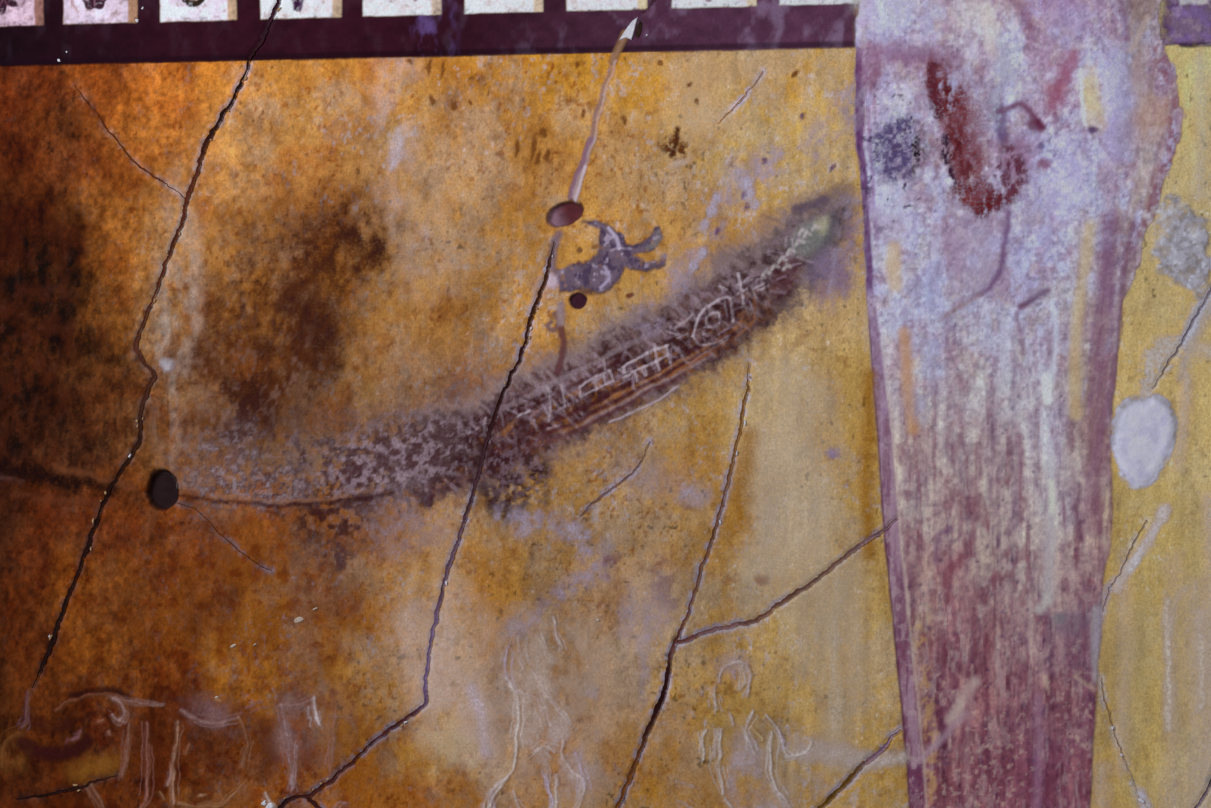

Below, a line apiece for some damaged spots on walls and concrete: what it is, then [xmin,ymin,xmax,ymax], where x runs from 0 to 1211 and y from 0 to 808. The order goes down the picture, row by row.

crack [717,71,763,124]
crack [32,0,281,688]
crack [1151,287,1211,389]
crack [261,242,554,808]
crack [580,441,650,516]
crack [615,366,901,808]
crack [1102,520,1147,612]
crack [16,774,117,799]
crack [1100,678,1148,808]
crack [1194,779,1211,808]